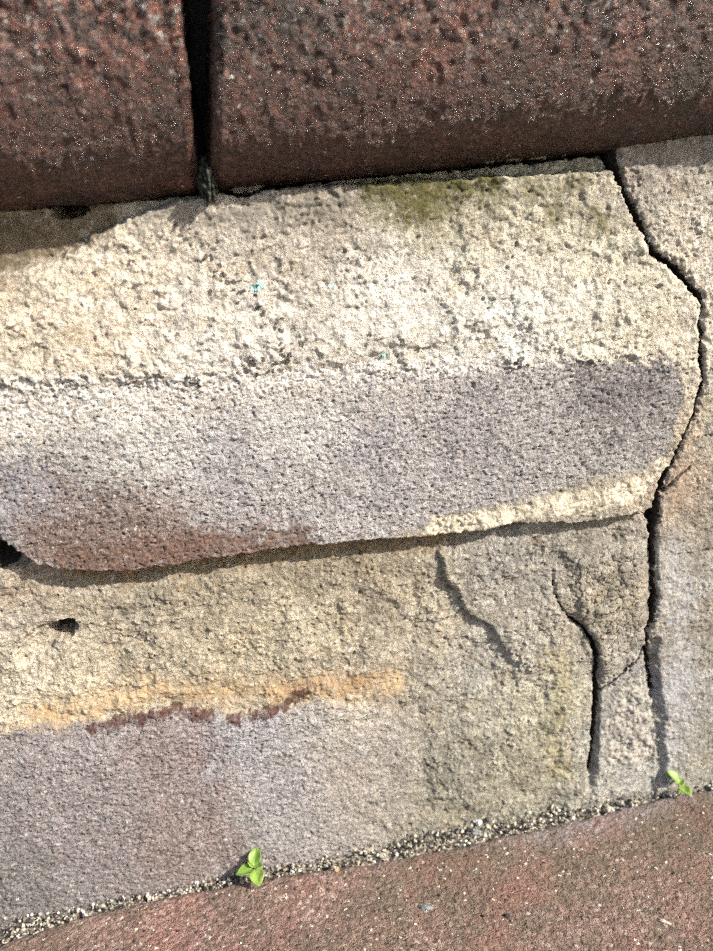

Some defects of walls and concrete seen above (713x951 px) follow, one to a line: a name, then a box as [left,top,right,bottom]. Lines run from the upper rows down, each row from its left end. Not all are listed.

crack [224,149,704,771]